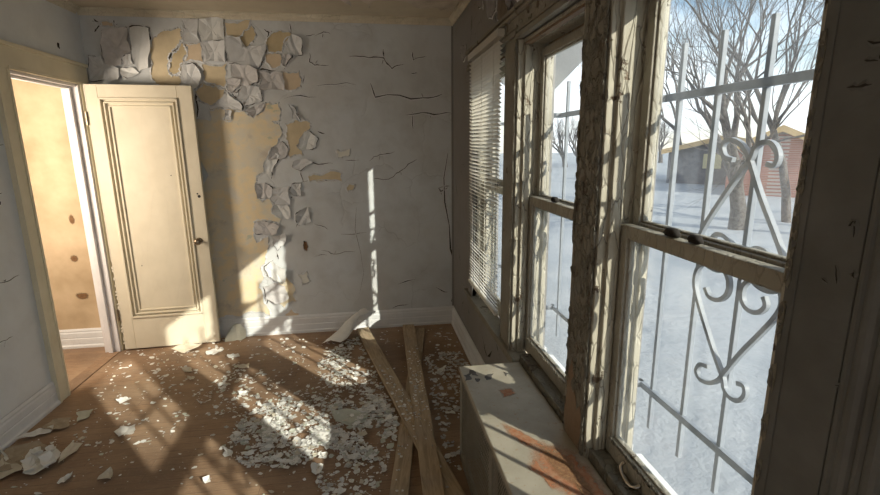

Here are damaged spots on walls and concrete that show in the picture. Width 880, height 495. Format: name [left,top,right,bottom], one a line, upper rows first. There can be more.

peeling [83,17,356,355]
crack [270,152,417,204]
crack [438,153,452,262]
peeling [563,0,609,450]
rust [505,426,606,495]